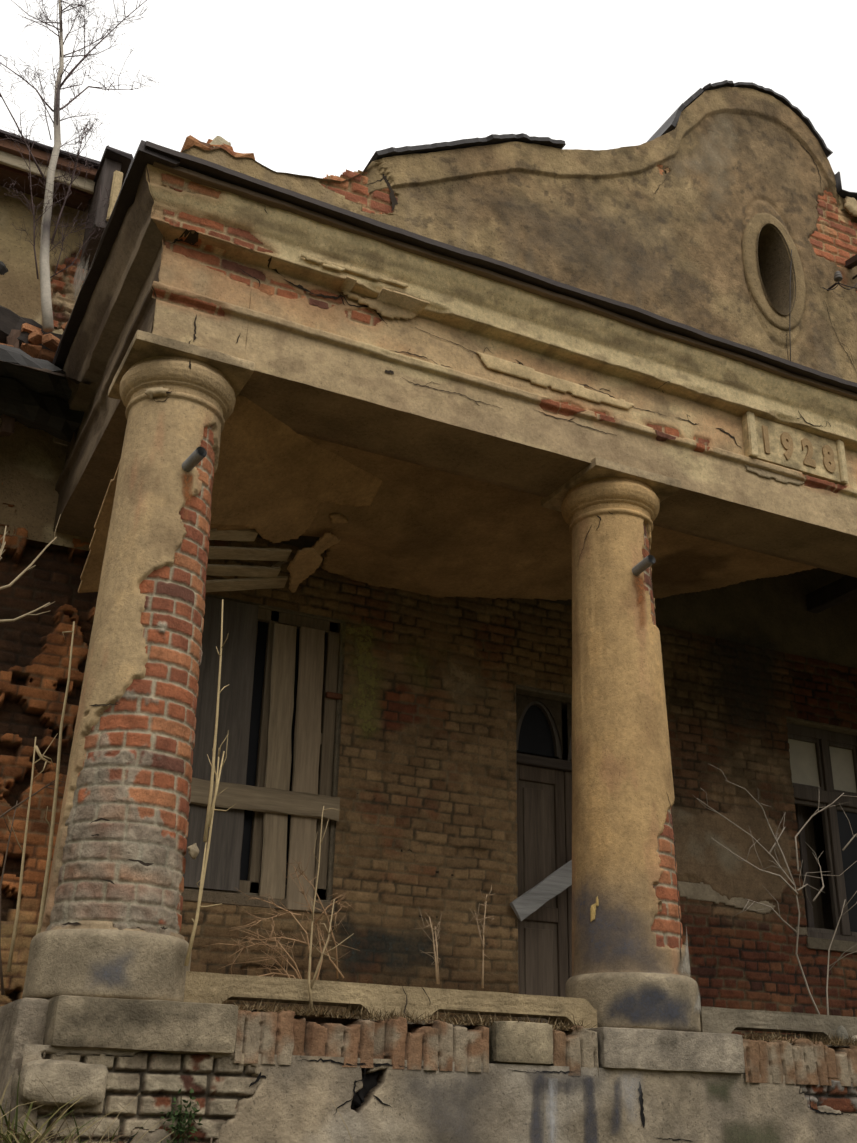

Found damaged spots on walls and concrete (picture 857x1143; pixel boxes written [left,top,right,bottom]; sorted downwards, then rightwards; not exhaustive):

flaking render [301,254,430,320]
crack [239,257,524,409]
flaking render [287,532,341,593]
flaking render [187,843,199,859]
flaking render [678,881,775,914]
crack [298,1058,439,1112]
damp [531,1074,561,1143]
damp [585,1078,597,1143]